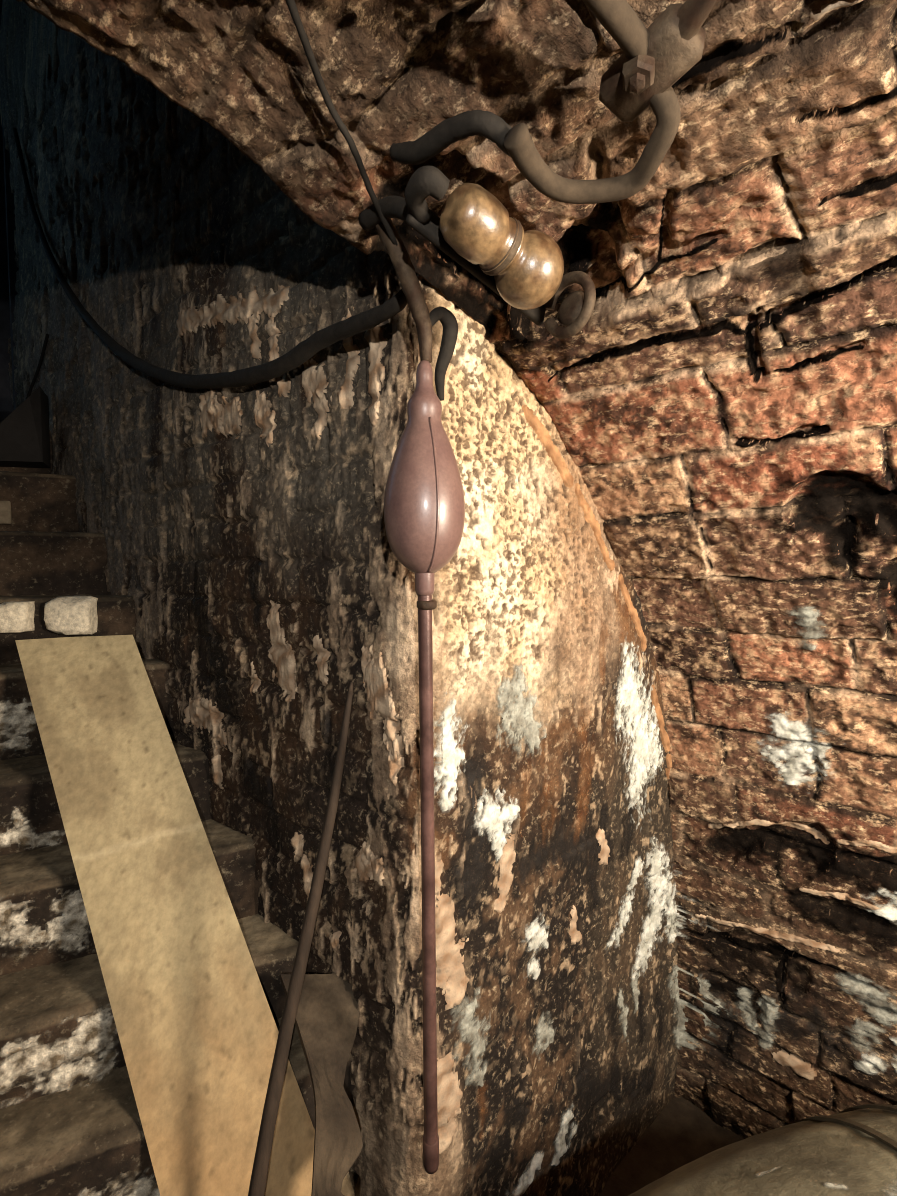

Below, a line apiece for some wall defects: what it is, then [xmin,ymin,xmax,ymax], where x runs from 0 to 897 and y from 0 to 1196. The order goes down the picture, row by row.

leakage [188,564,235,723]
leakage [498,664,546,754]
leakage [434,699,520,913]
leakage [518,642,897,1111]
leakage [479,1097,530,1178]
leakage [510,1111,577,1196]